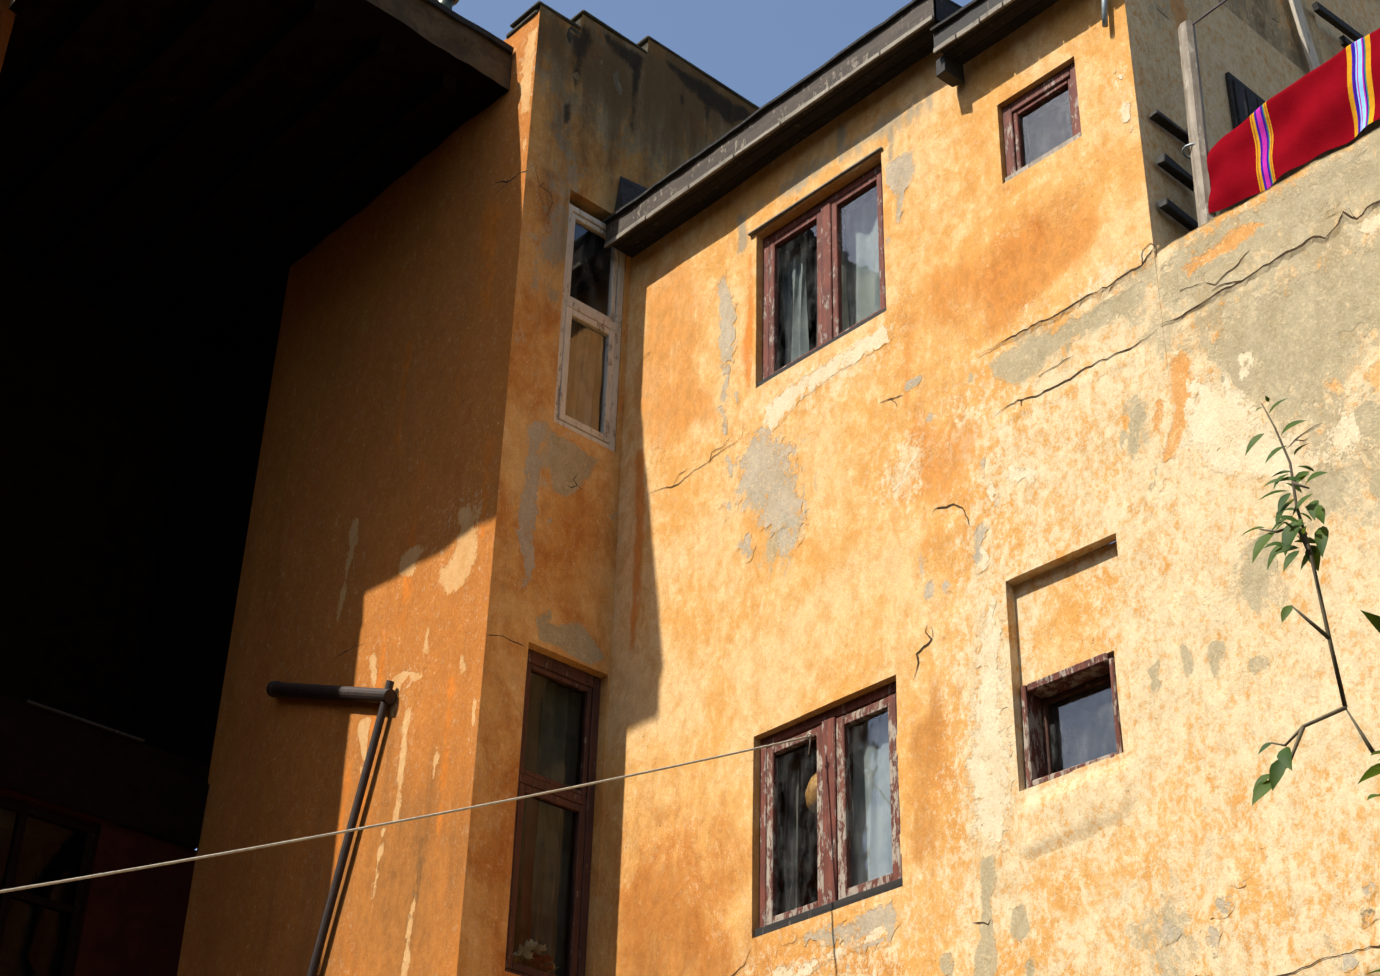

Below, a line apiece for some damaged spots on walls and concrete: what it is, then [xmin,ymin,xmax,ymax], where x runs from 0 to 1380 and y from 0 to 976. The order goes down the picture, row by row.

flaking render [989,135,1380,389]
crack [978,200,1380,414]
flaking render [1177,230,1380,451]
crack [646,425,743,496]
flaking render [716,271,811,564]
flaking render [1119,393,1166,462]
flaking render [1279,451,1380,522]
flaking render [1239,524,1285,613]
crack [913,626,933,680]
flaking render [1178,640,1226,681]
flaking render [760,897,903,976]
crack [1277,945,1380,976]